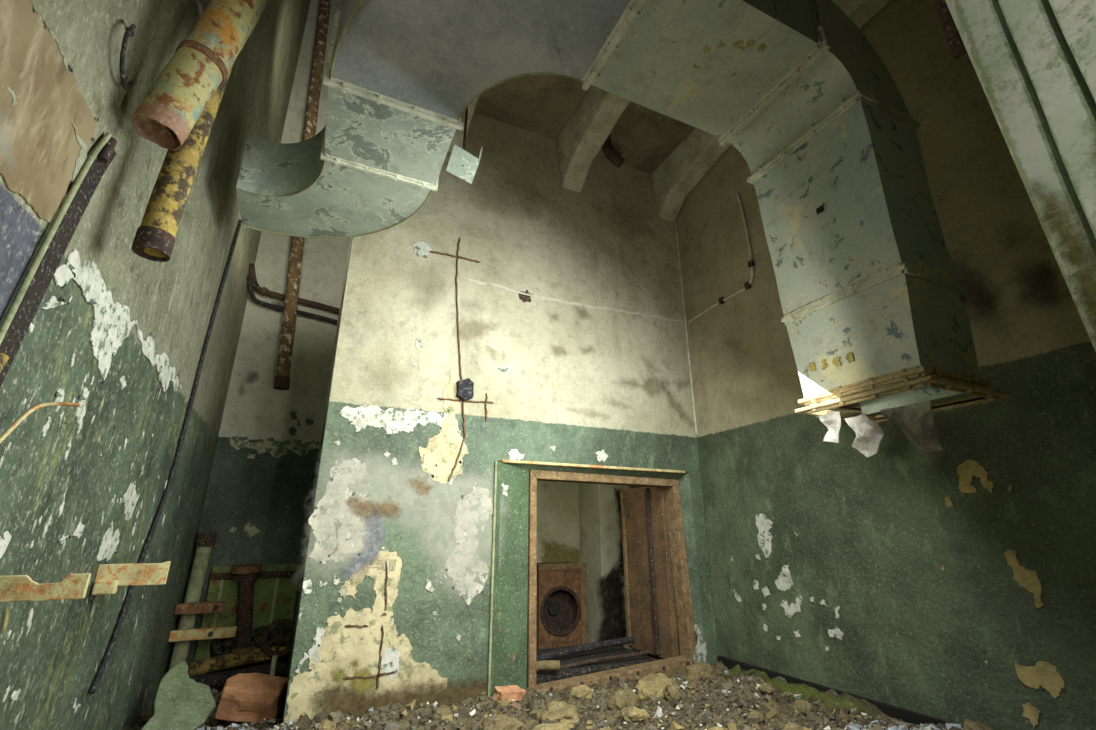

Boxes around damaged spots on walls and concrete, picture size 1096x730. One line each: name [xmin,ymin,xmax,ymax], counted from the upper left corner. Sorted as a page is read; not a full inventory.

leakage [1040,195,1096,340]
peeling [38,249,182,460]
peeling [230,411,320,461]
peeling [336,238,509,609]
peeling [944,460,996,508]
peeling [755,513,773,560]
peeling [3,606,34,646]
spalling [284,441,448,723]
peeling [753,565,844,652]
peeling [1004,549,1044,609]
peeling [1015,661,1065,699]
peeling [1022,703,1041,728]